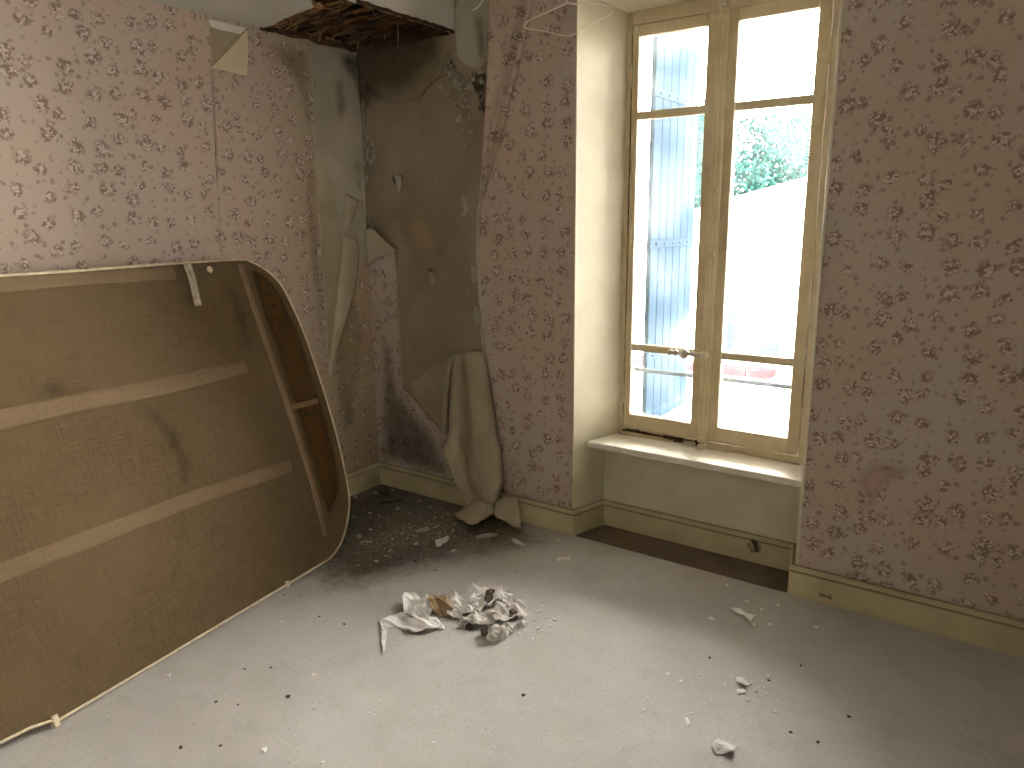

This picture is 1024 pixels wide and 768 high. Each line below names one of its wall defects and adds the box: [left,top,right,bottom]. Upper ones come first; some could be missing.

peeling [311,0,488,390]